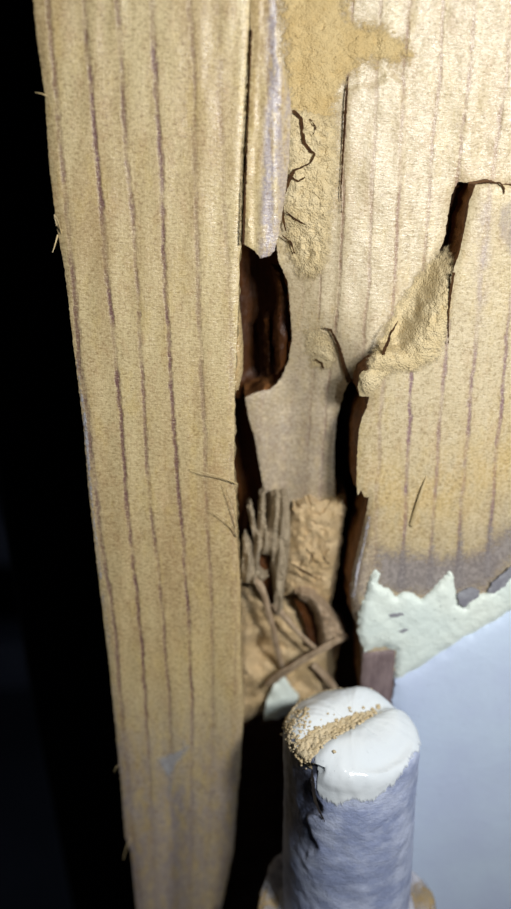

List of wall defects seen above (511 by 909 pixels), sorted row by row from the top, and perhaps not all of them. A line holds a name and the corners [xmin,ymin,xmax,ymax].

crack [282,110,317,254]
crack [340,76,349,213]
crack [477,181,505,193]
crack [315,321,398,383]
crack [447,272,455,344]
peeling [356,567,511,705]